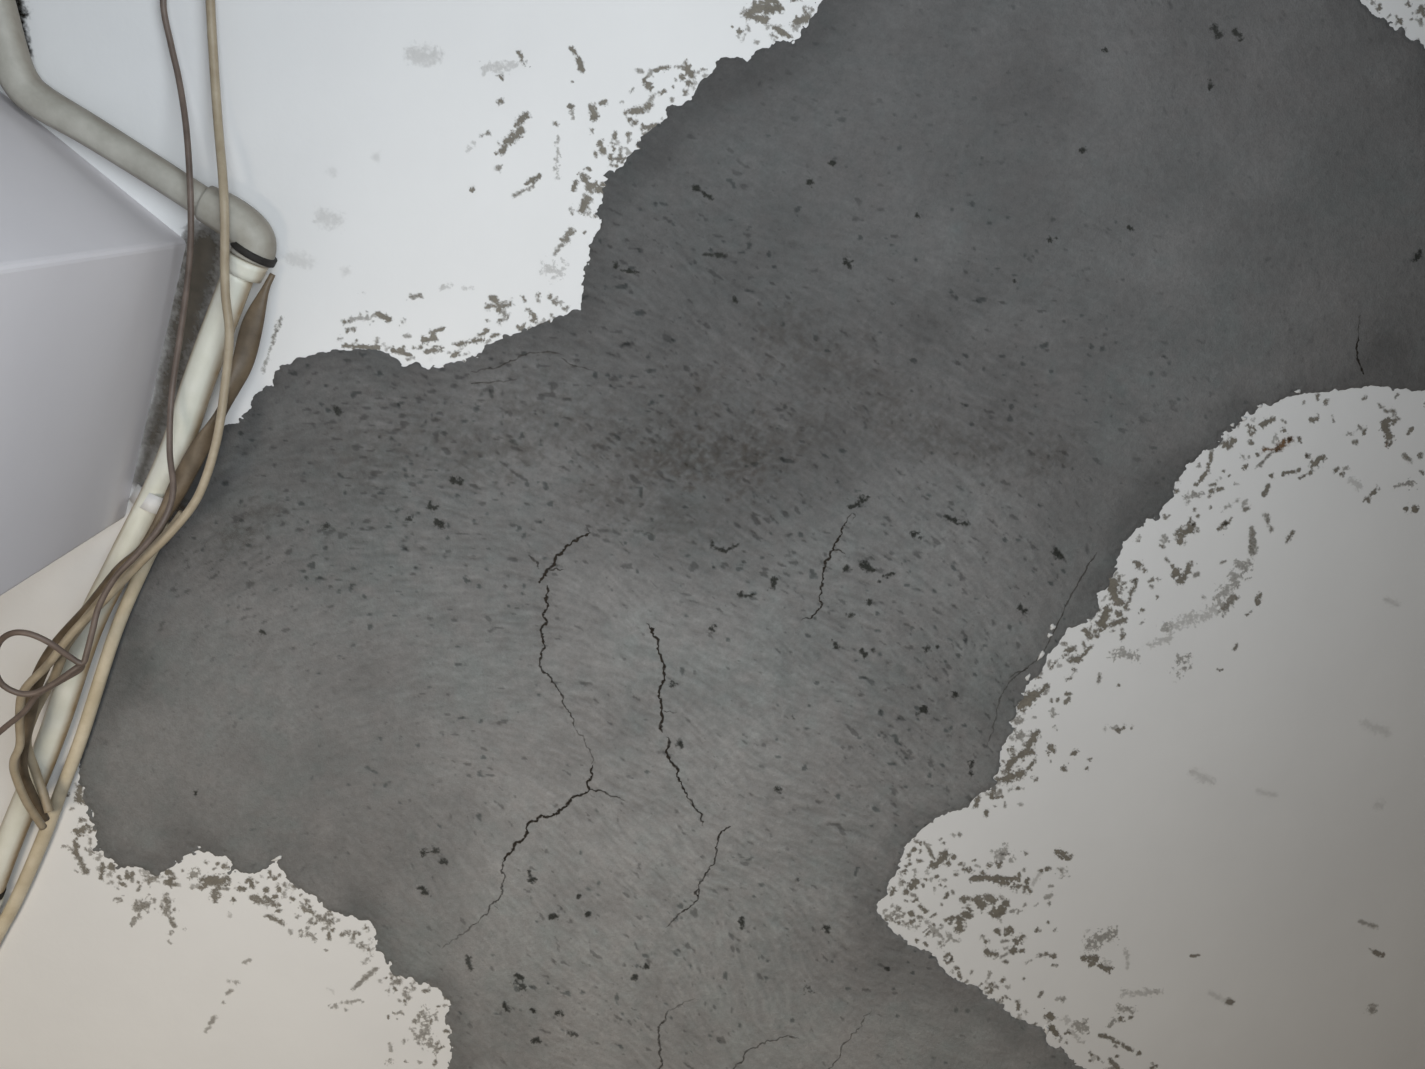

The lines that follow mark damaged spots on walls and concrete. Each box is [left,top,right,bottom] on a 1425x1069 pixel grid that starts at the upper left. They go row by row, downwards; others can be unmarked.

crack [536,530,589,726]
crack [803,513,854,619]
spalling [843,561,895,583]
peeling [1025,624,1056,681]
crack [482,765,617,917]
crack [646,623,731,927]